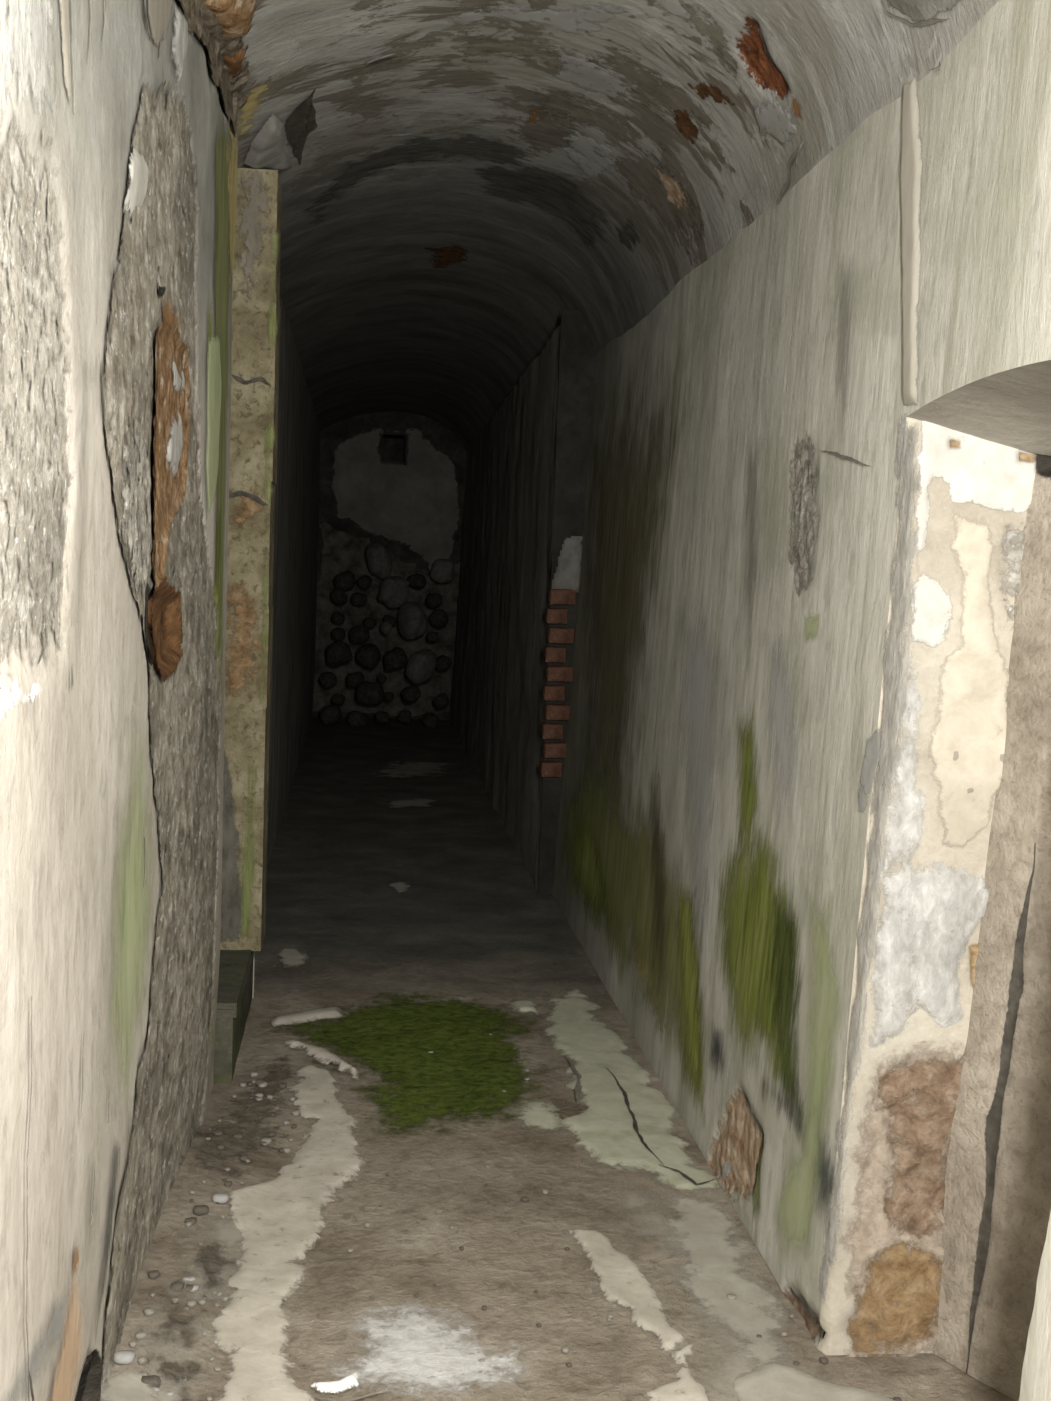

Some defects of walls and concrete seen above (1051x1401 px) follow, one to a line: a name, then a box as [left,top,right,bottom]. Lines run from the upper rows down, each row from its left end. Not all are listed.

peeling [304,0,734,268]
flaking render [680,0,801,144]
flaking render [0,0,72,690]
flaking render [102,0,259,1382]
water stain [632,624,724,1105]
water stain [737,659,795,849]
peeling [819,415,1036,1358]
crack [565,1056,714,1185]
water stain [752,1143,763,1215]
water stain [770,898,833,1207]
flaking render [785,1286,823,1341]